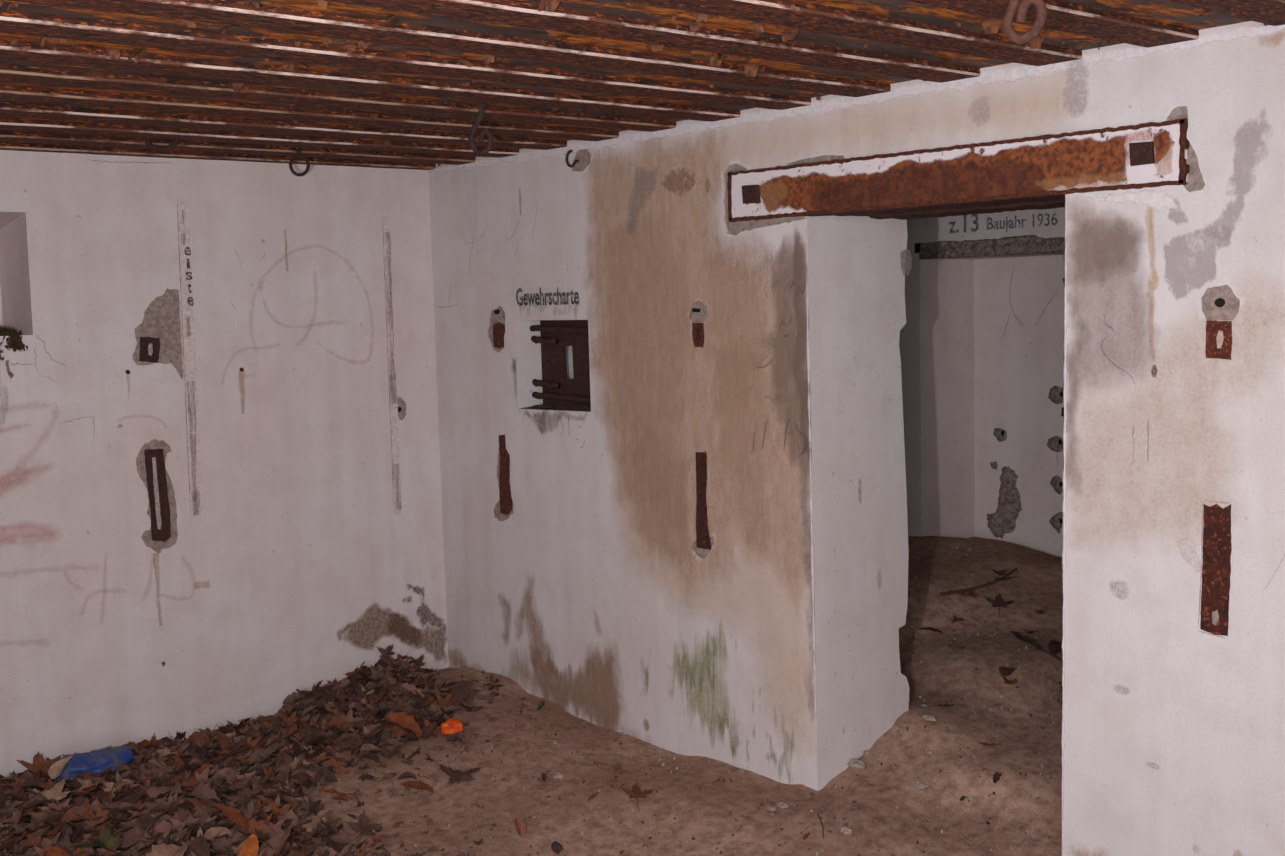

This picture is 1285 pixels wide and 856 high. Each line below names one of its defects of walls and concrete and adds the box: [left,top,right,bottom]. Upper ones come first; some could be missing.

corrosion [0,33,237,63]
corrosion [537,0,562,12]
corrosion [548,30,664,52]
corrosion [672,11,801,41]
corrosion [980,18,1111,54]
flaking render [1167,106,1188,121]
corrosion [759,131,1172,215]
flaking render [1183,142,1205,192]
flaking render [133,288,189,380]
leakage [594,146,811,577]
flaking render [136,439,178,553]
spalling [987,461,1022,539]